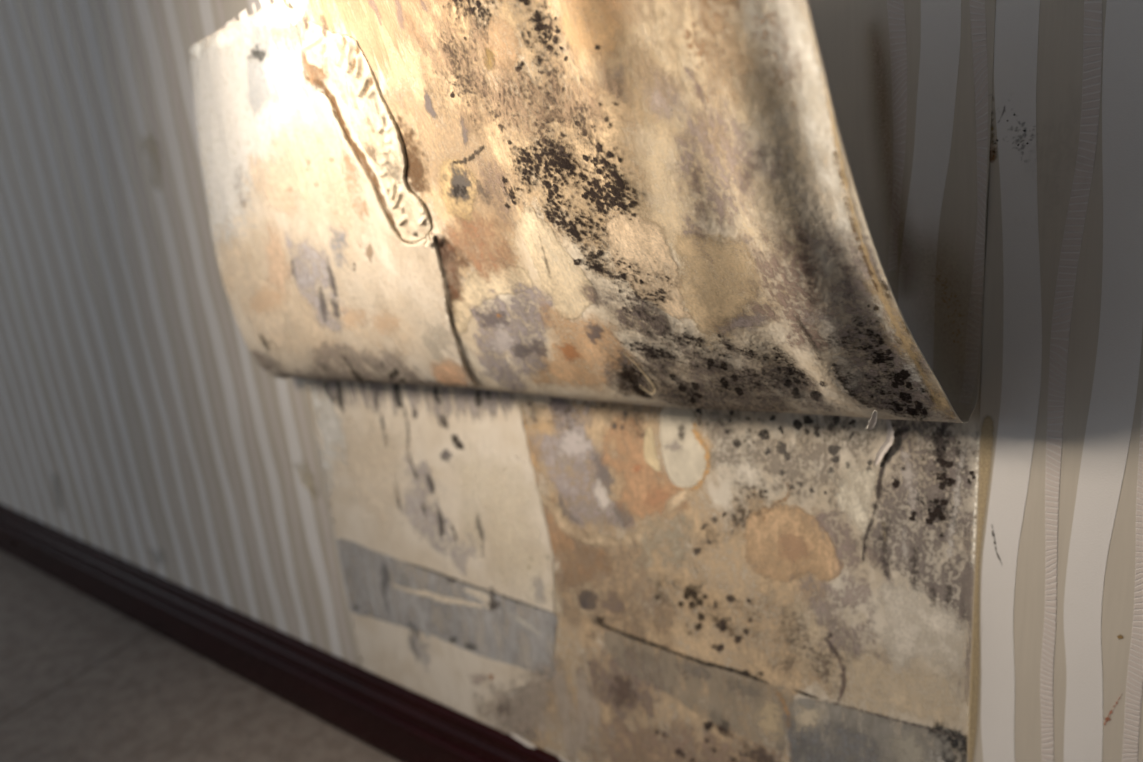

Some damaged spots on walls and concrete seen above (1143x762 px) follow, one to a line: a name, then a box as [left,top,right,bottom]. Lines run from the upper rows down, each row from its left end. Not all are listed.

damp [191,0,993,762]
peeling [391,584,490,612]
crack [592,617,966,740]
peeling [795,705,823,731]
flaking render [511,733,536,748]